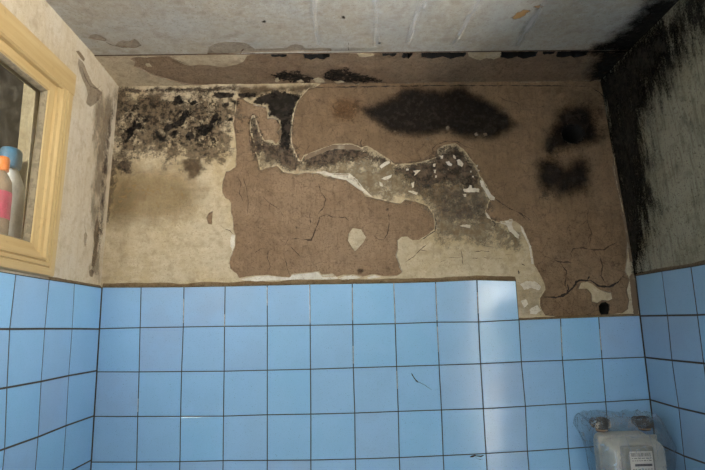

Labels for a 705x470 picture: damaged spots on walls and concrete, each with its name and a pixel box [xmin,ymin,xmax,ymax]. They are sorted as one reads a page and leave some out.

peeling [76,50,102,107]
damp [323,67,382,84]
damp [91,70,519,275]
flaking render [131,42,638,317]
damp [585,0,705,278]
crack [254,184,349,275]
crack [539,210,624,298]